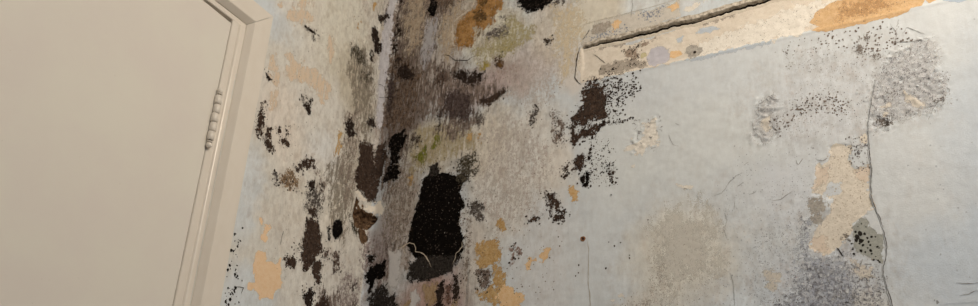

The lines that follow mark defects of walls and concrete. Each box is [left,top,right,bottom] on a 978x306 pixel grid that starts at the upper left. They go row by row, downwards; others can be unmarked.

water stain [225,227,243,306]
peeling [247,217,282,300]
water stain [254,62,315,155]
water stain [272,0,642,306]
crack [574,0,787,84]
water stain [618,152,896,306]
flaking render [577,0,966,83]
water stain [760,21,913,155]
peeling [807,133,883,264]
crack [866,80,893,306]